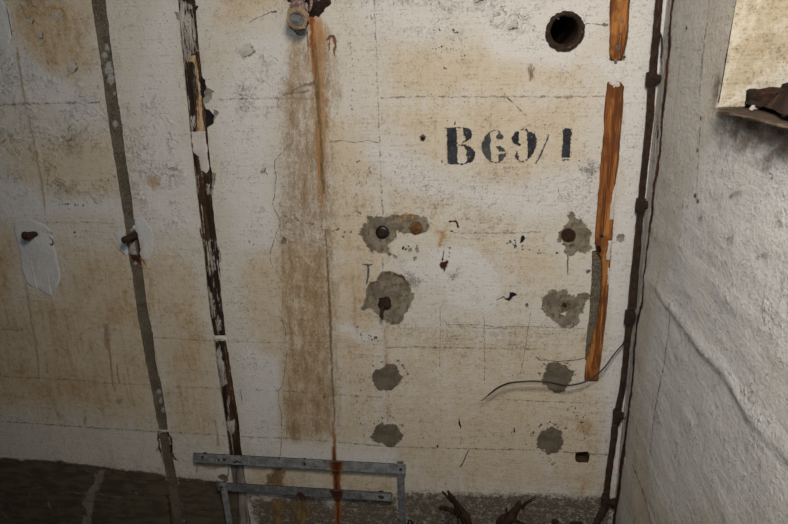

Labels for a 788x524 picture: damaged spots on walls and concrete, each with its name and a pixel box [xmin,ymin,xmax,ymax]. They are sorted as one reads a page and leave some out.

corrosion [294,0,337,205]
corrosion [130,238,145,267]
corrosion [198,230,396,524]